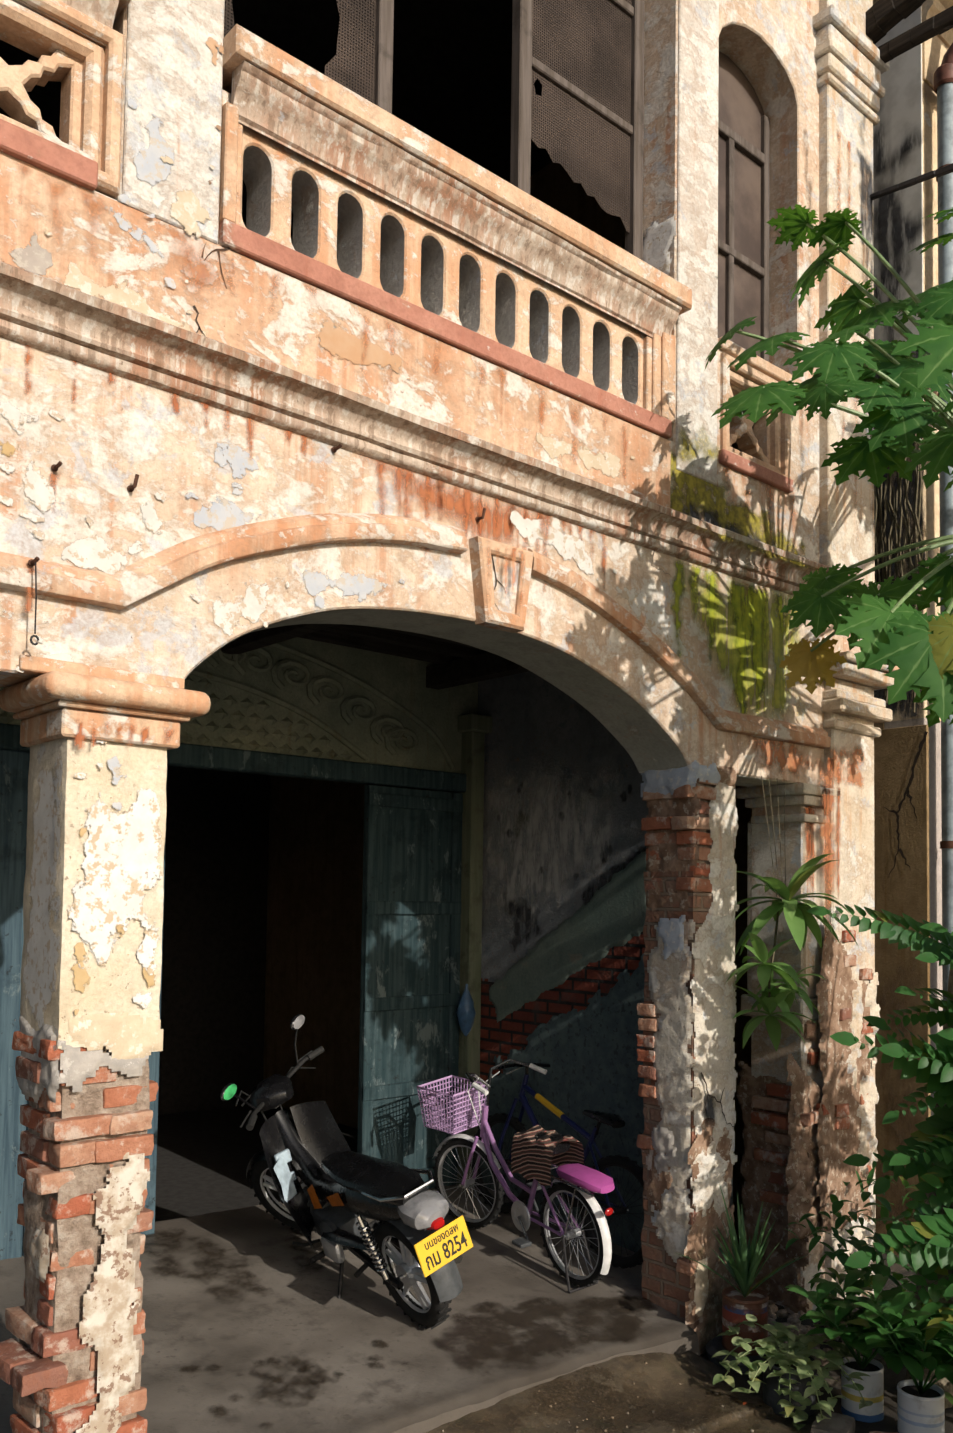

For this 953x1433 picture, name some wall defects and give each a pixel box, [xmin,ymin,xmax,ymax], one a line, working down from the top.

peeling [104,99,219,289]
water stain [859,102,924,303]
peeling [9,229,207,336]
peeling [61,492,166,574]
peeling [185,442,277,531]
water stain [874,467,927,584]
water stain [671,562,786,714]
water stain [874,689,922,720]
crack [884,731,928,875]
spalling [0,740,164,1433]
spalling [479,760,881,1355]
water stain [436,1296,654,1369]